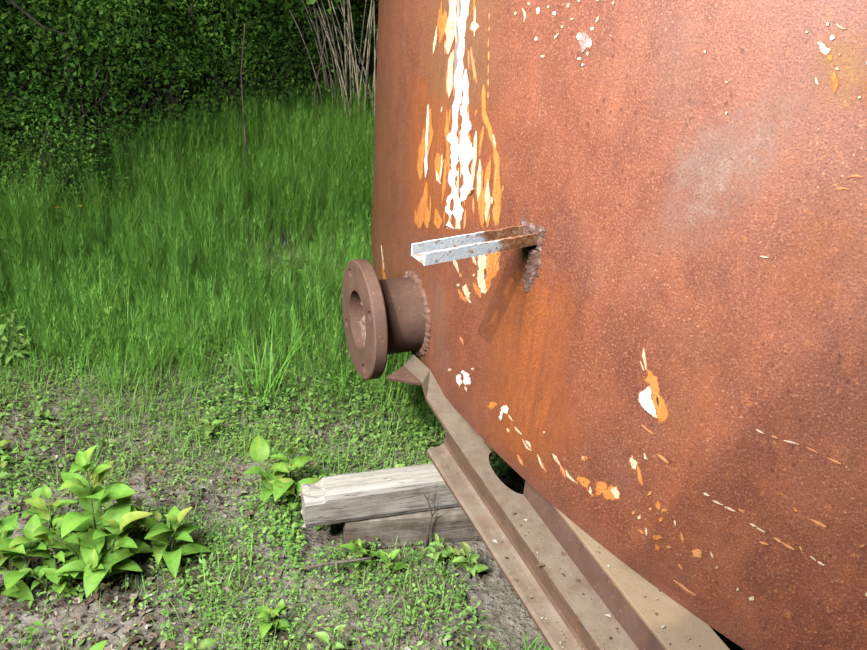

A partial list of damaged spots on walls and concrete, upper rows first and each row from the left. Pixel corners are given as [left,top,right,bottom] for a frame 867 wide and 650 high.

peeling [577,16,600,66]
peeling [817,22,847,93]
peeling [424,0,491,231]
corrosion [414,0,504,230]
peeling [453,252,501,304]
corrosion [488,276,562,472]
peeling [638,348,670,434]
peeling [499,405,543,468]
corrosion [577,477,620,500]